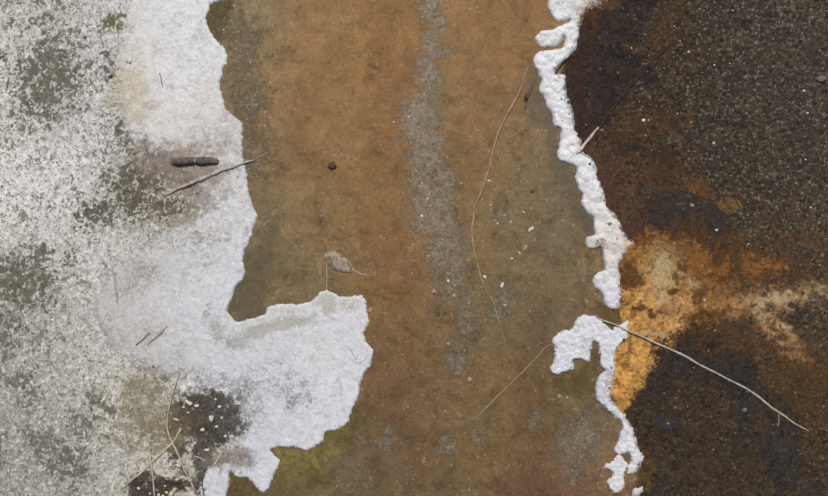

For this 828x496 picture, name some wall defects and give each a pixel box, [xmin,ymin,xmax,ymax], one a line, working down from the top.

spalling [209,5,274,185]
water stain [90,0,664,496]
spalling [390,0,518,377]
rust [610,221,828,413]